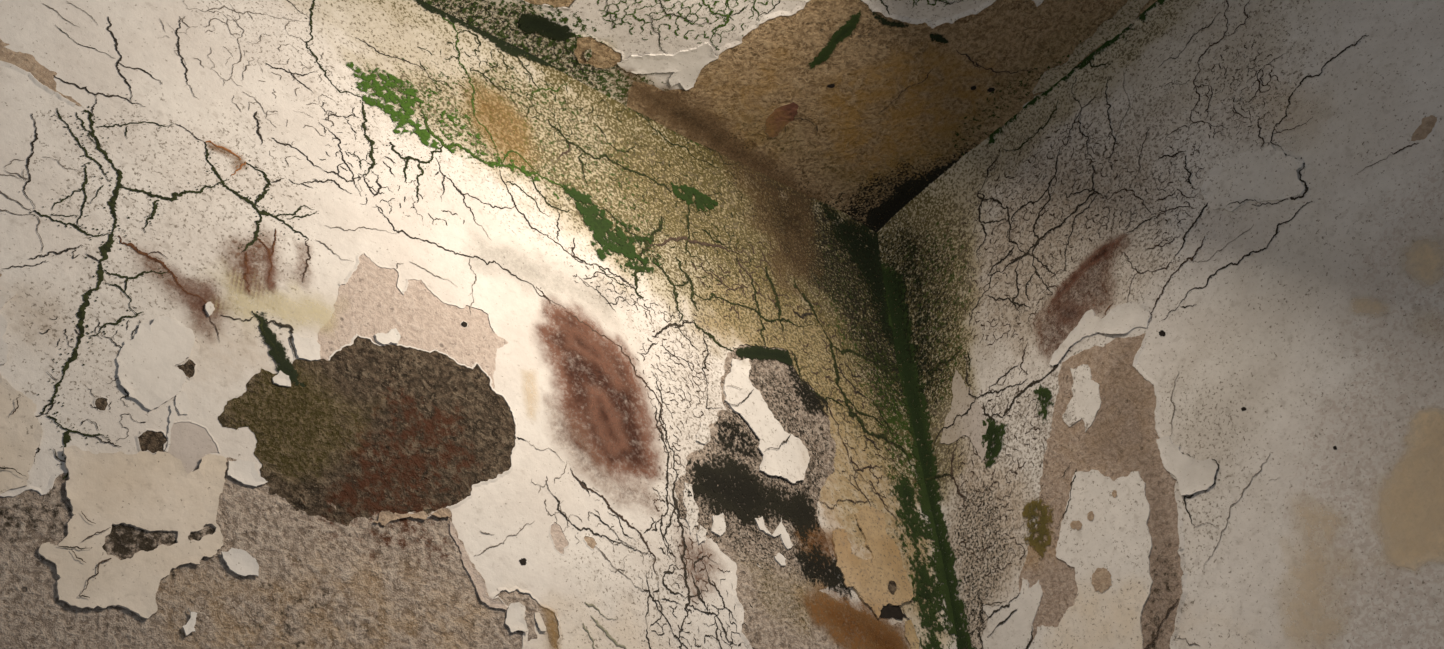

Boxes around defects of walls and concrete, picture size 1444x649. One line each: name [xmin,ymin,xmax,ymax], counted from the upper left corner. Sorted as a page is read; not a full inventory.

spalling [572,0,1157,228]
spalling [0,251,563,649]
crack [0,0,920,649]
corrosion [537,304,658,497]
water stain [685,416,854,599]
water stain [633,83,961,397]
corrosion [804,593,907,649]
corrosion [1036,236,1125,357]
flaking render [1018,301,1218,649]
crack [925,0,1369,529]
crack [1170,373,1279,561]
water stain [1380,409,1444,570]